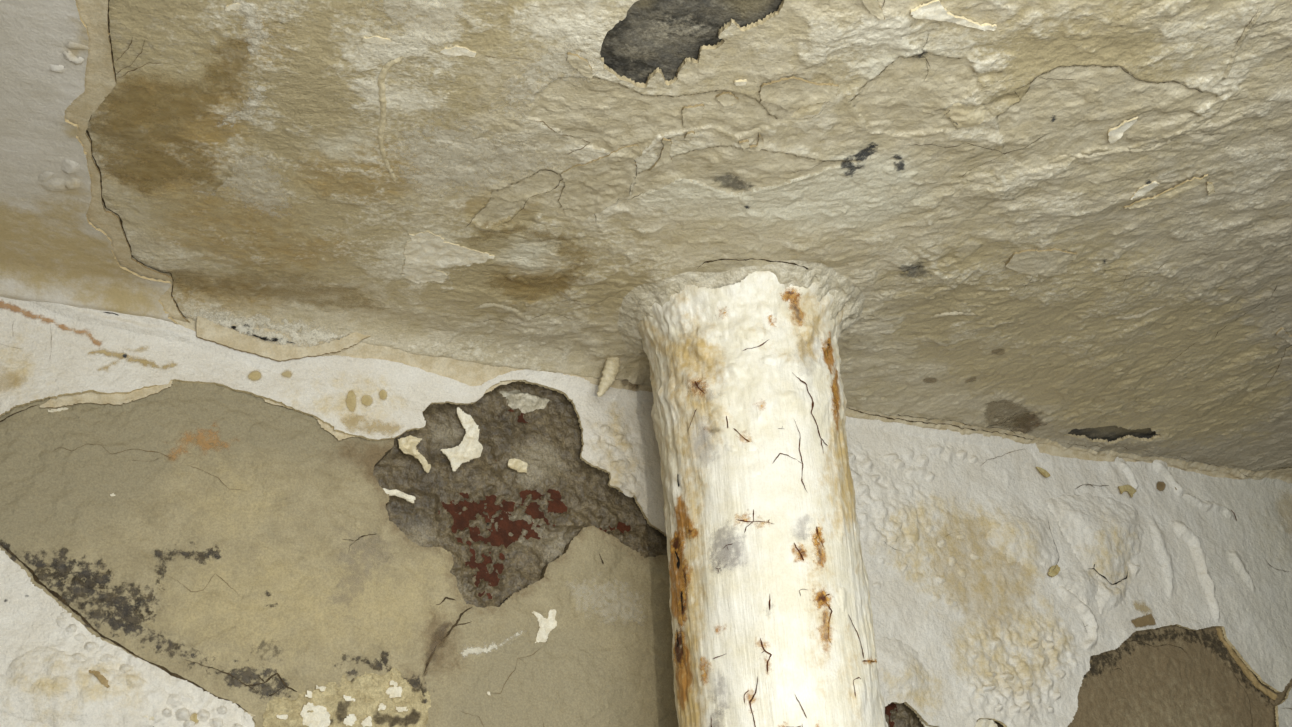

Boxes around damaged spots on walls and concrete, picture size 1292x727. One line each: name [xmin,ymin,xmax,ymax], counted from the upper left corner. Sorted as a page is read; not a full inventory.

crack [108,0,158,79]
water stain [90,0,269,192]
crack [86,115,187,319]
crack [467,119,588,227]
rust [0,301,176,370]
peeling [0,0,679,727]
water stain [1013,413,1046,434]
rust [793,527,826,567]
water stain [0,540,290,698]
rust [815,590,831,648]
spalling [885,703,933,727]
peeling [1067,614,1292,727]